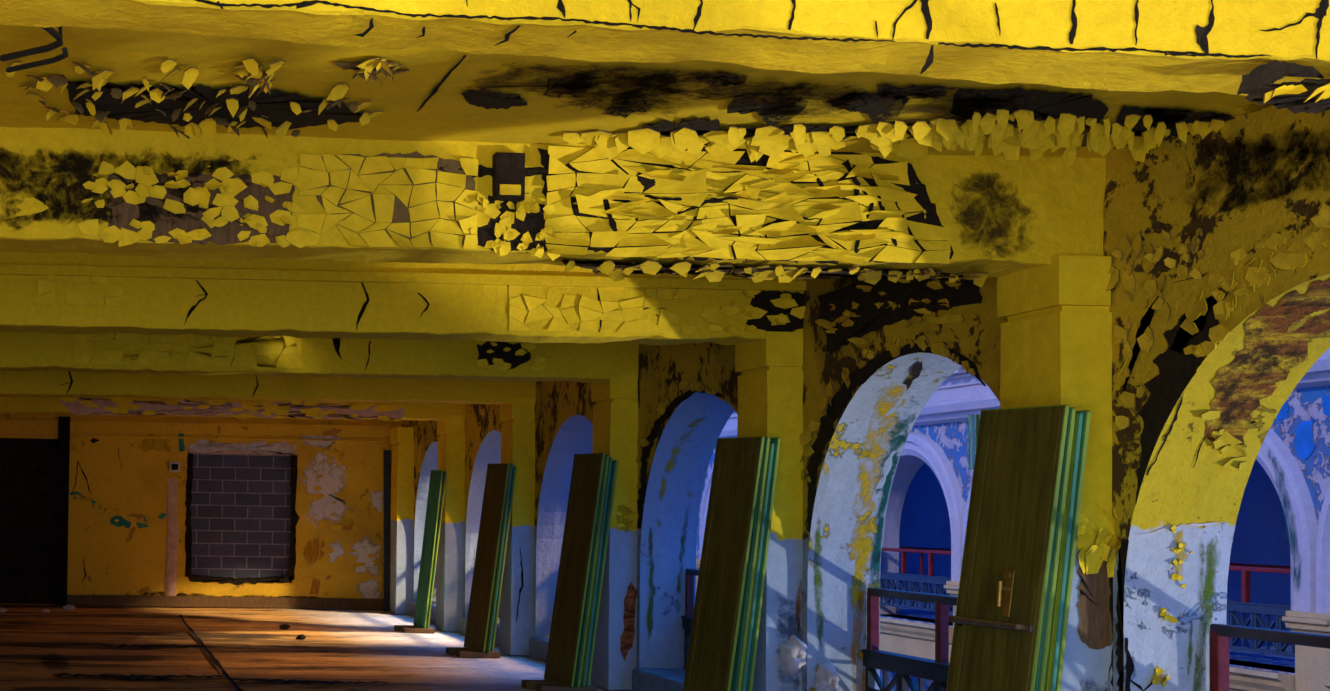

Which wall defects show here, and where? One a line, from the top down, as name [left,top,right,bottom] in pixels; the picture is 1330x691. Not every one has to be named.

peeling [5,57,409,141]
crack [195,0,1329,112]
damp [1142,109,1189,124]
peeling [1237,60,1330,114]
damp [1187,126,1330,218]
crack [184,280,208,325]
crack [332,282,371,370]
crack [418,292,430,318]
peeling [59,71,1235,532]
spalling [1106,203,1330,503]
crack [53,615,390,691]
spalling [1077,539,1129,691]